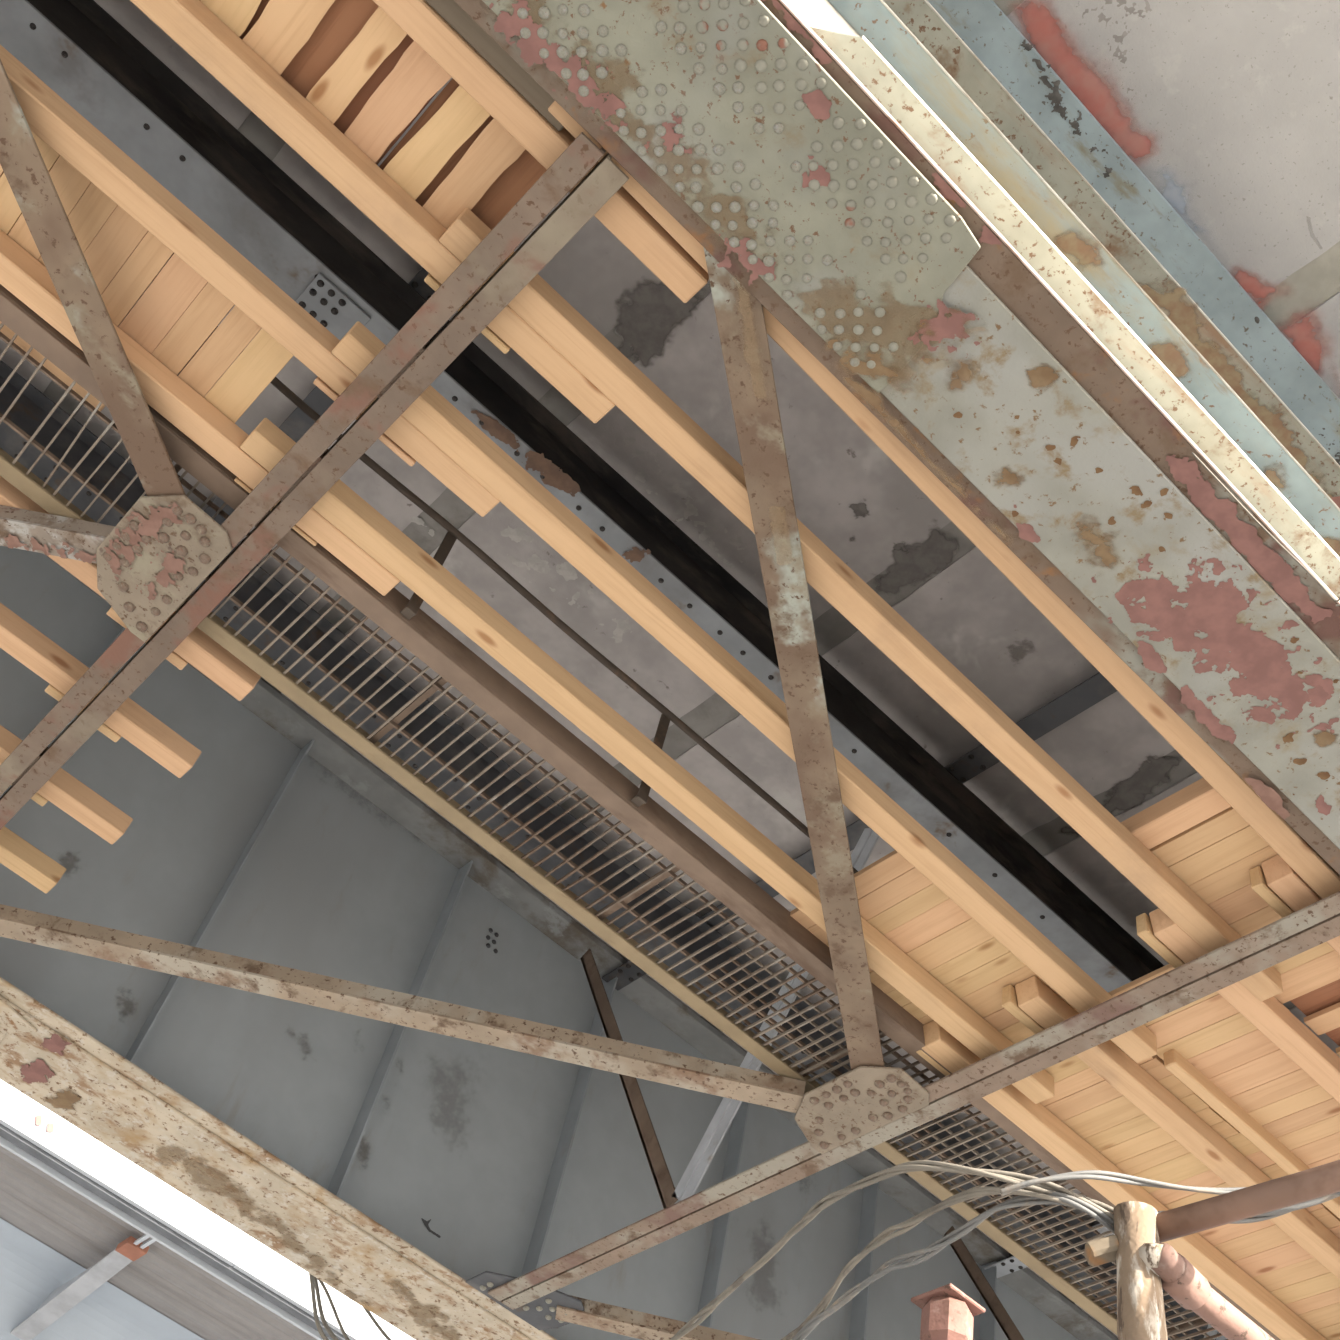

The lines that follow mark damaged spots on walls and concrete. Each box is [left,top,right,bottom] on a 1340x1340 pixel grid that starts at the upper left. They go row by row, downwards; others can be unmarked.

peeling [489,0,628,132]
peeling [644,111,692,154]
corrosion [1055,232,1102,266]
leakage [615,280,710,367]
corrosion [1140,282,1335,498]
leakage [850,503,868,518]
leakage [875,529,957,594]
corrosion [1322,537,1340,557]
peeling [1108,453,1339,744]
leakage [1103,756,1179,814]
peeling [1315,795,1332,816]